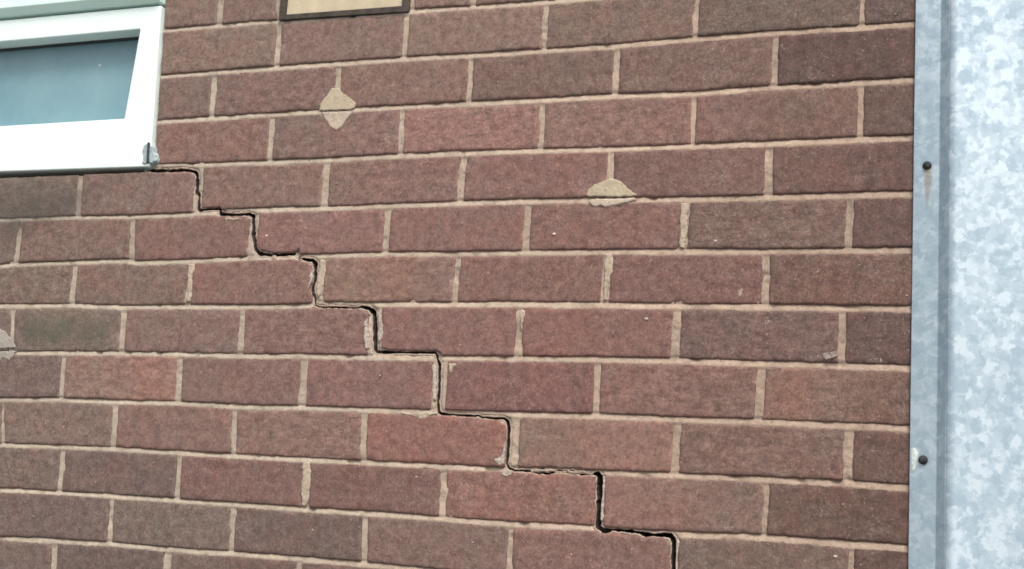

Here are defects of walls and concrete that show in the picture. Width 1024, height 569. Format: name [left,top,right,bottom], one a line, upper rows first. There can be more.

crack [144,167,680,569]